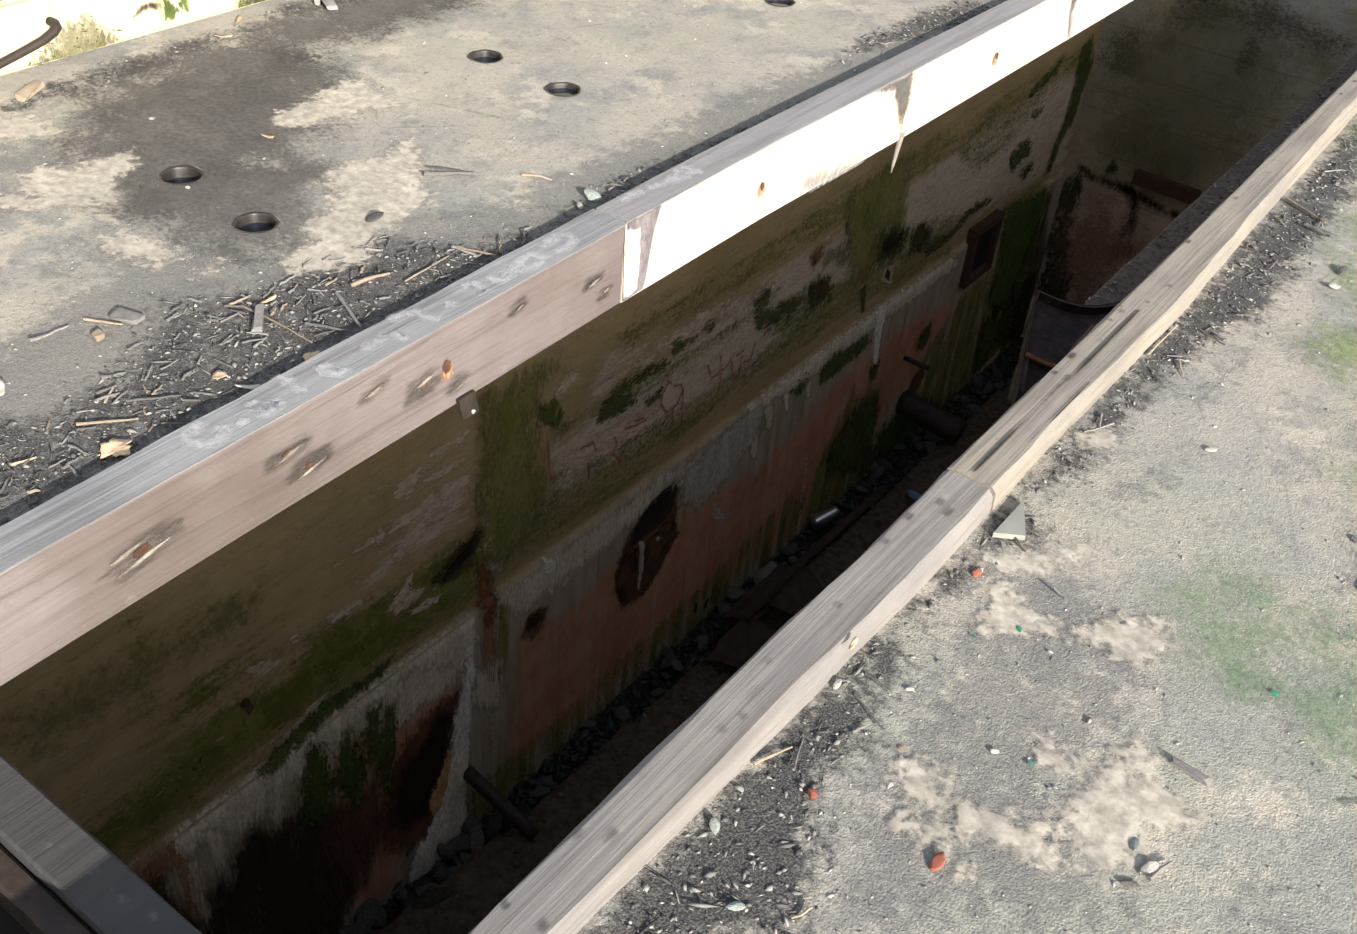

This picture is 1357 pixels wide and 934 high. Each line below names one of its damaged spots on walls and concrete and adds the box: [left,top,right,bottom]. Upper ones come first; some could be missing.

damp [971,161,1180,375]
spalling [614,482,680,609]
damp [481,257,959,620]
damp [132,609,504,934]